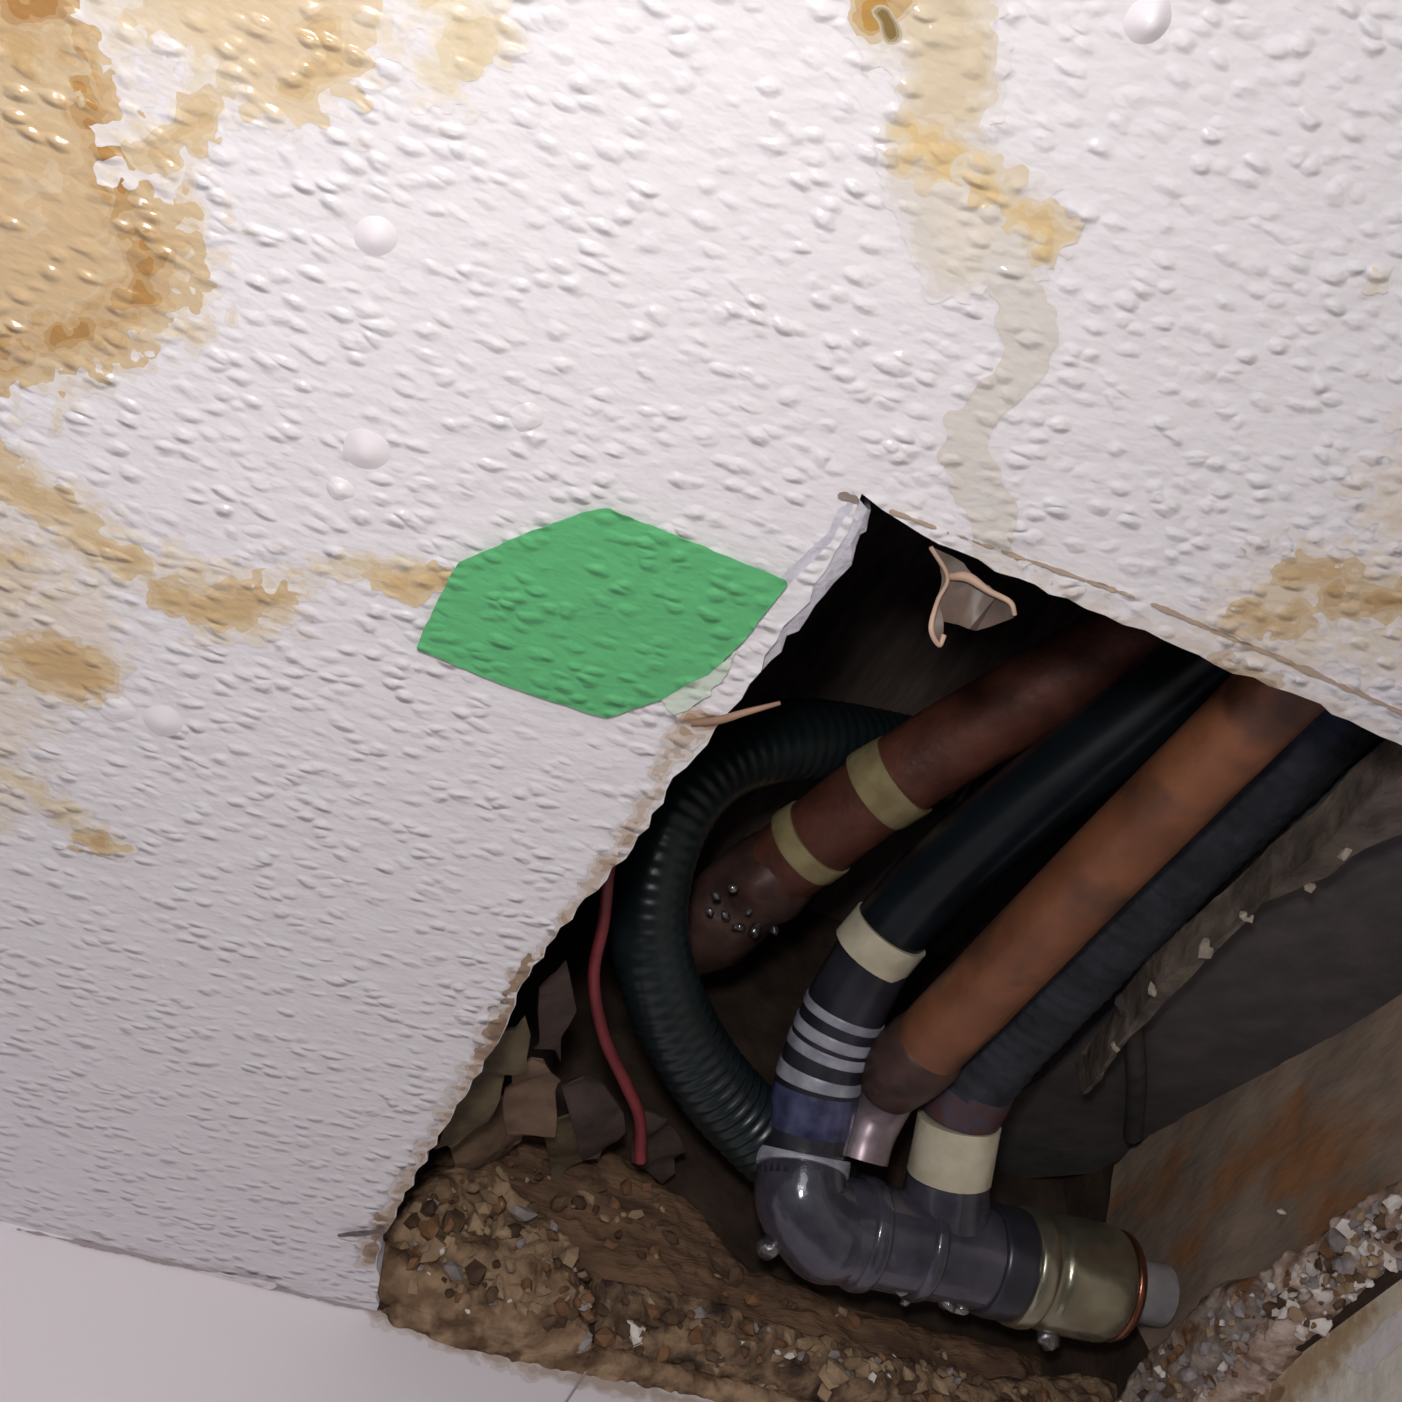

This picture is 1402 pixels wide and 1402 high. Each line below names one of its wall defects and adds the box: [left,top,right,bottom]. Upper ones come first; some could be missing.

water stain [841,0,1087,555]
water stain [1361,266,1395,295]
water stain [0,0,542,862]
peeling [662,620,760,715]
flaking render [762,491,871,670]
water stain [1158,404,1402,710]
flaking render [1198,938,1214,959]
flaking render [1239,911,1254,923]
flaking render [1337,848,1352,861]
flaking render [377,1165,1402,1402]